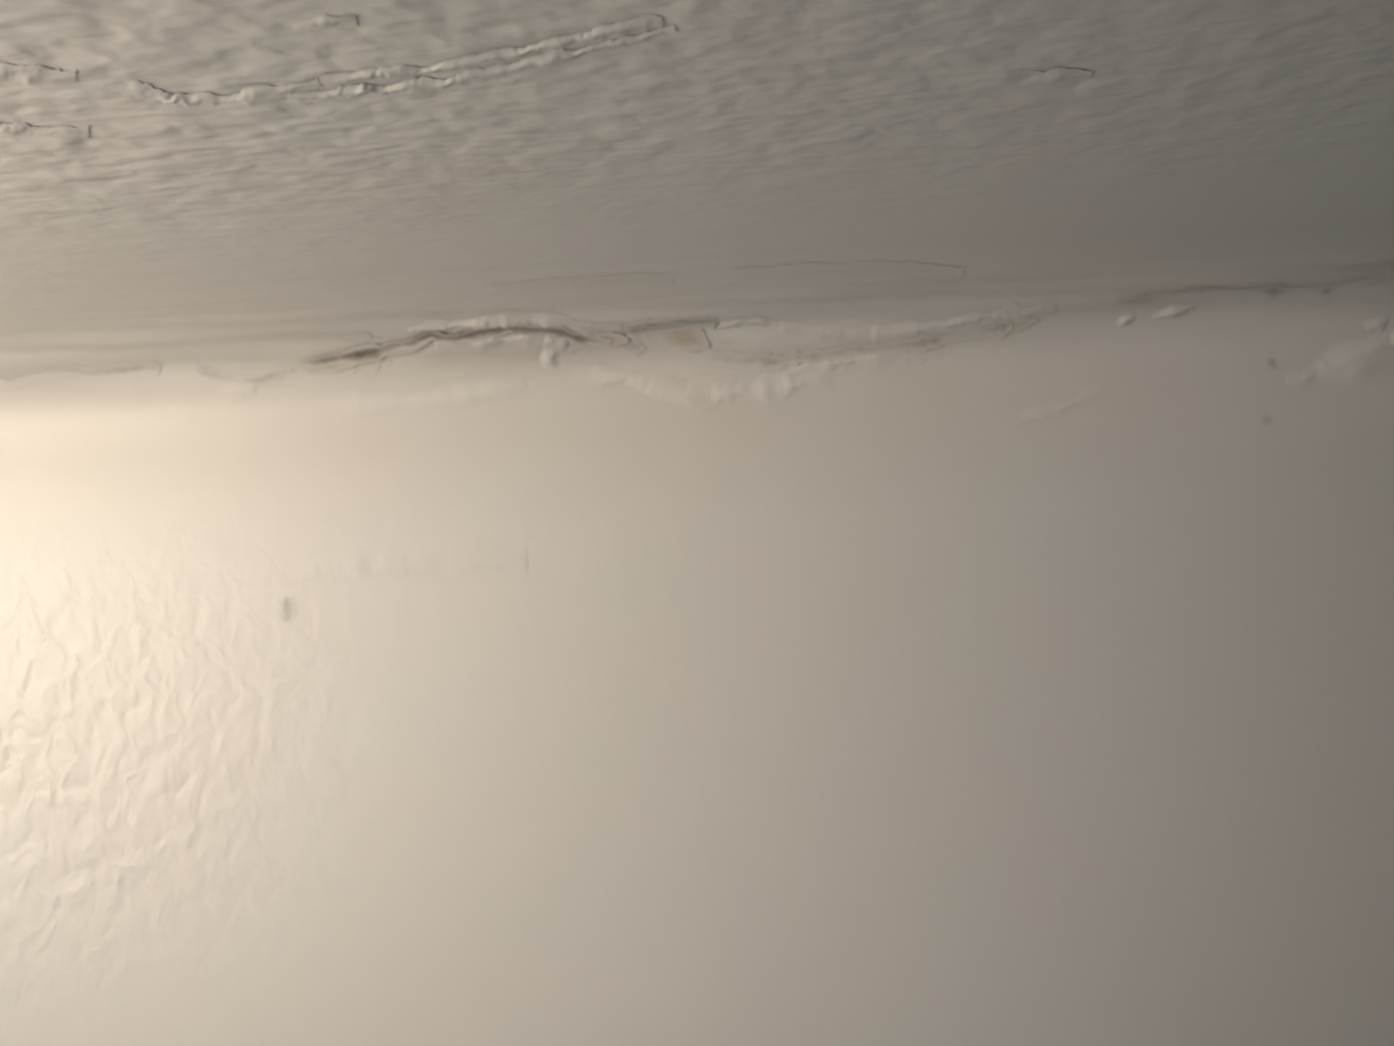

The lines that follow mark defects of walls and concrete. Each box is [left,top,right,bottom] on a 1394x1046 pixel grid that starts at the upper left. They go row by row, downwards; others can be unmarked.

crack [194,310,1039,385]